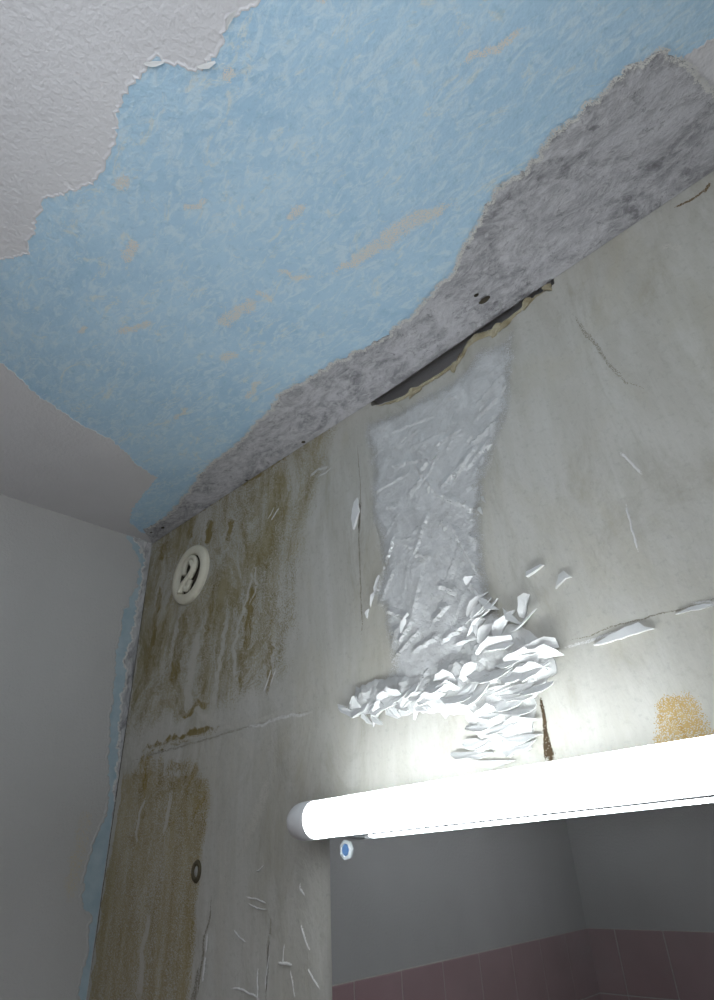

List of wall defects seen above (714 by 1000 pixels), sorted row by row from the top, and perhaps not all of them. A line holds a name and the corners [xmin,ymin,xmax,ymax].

peeling [0,0,714,543]
peeling [76,535,152,1000]
spalling [180,555,200,594]
damp [89,424,337,1000]
flaking render [337,334,564,768]
corrosion [652,690,714,744]